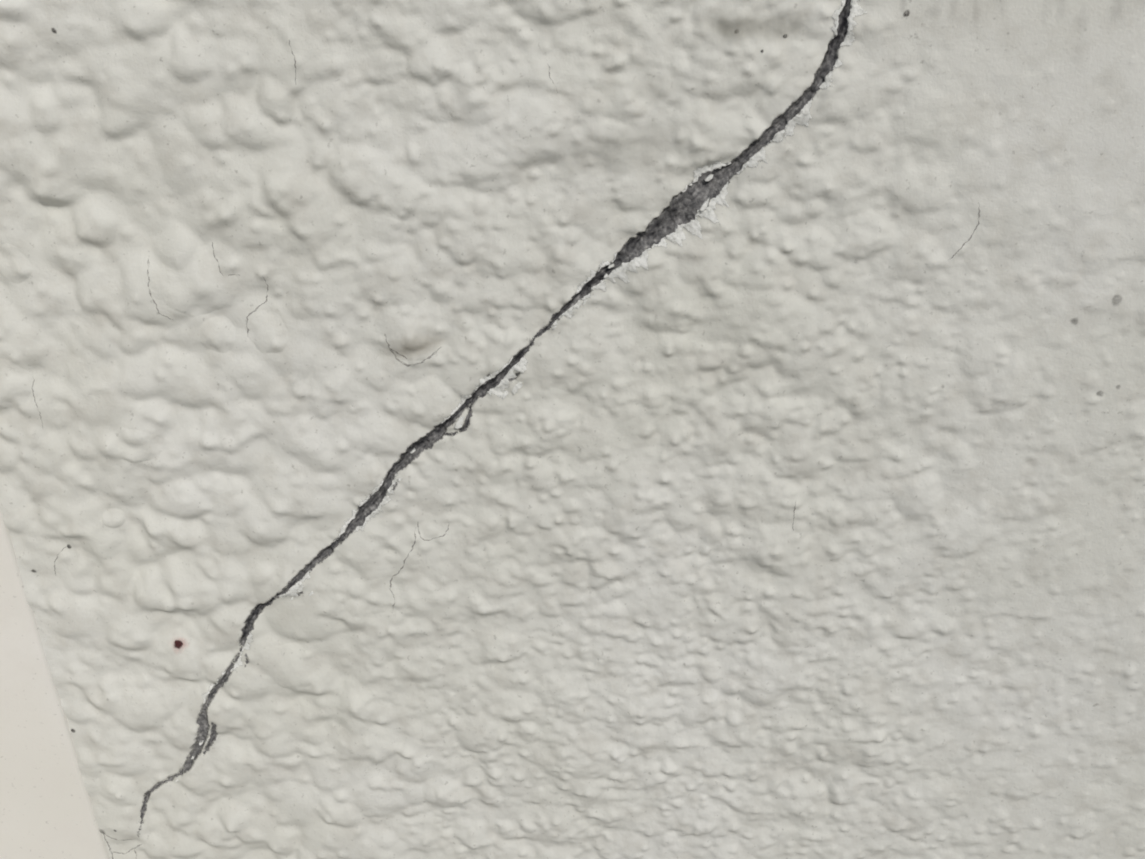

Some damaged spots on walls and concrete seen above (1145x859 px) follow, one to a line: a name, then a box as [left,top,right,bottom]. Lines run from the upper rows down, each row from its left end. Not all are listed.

crack [104,0,867,859]